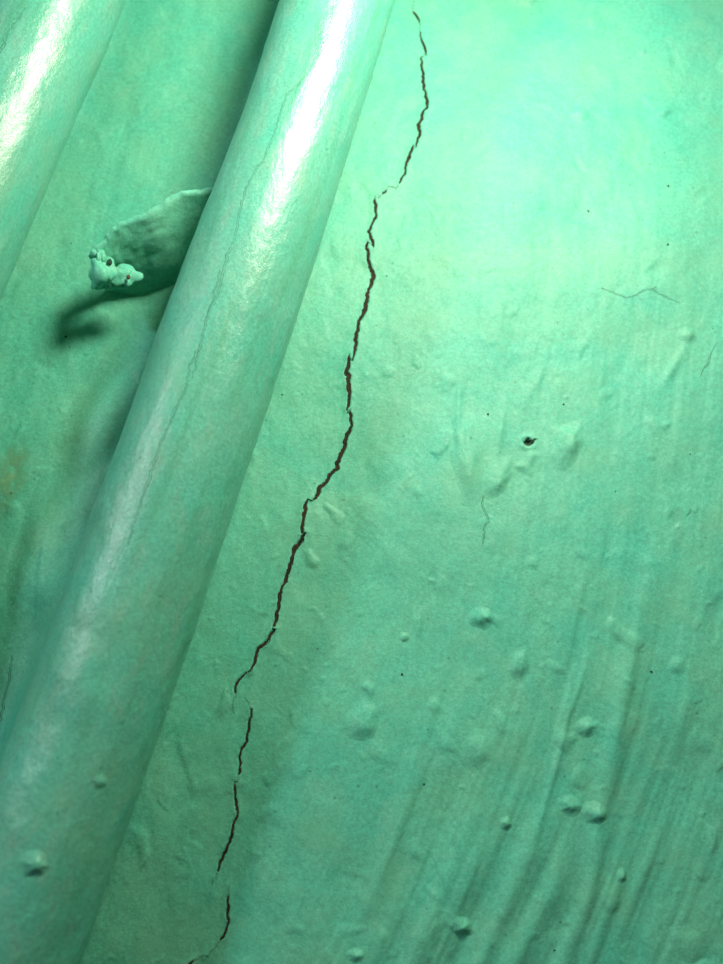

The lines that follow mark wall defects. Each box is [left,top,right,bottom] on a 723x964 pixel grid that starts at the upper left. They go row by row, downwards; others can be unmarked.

crack [127,6,334,545]
crack [189,1,429,964]